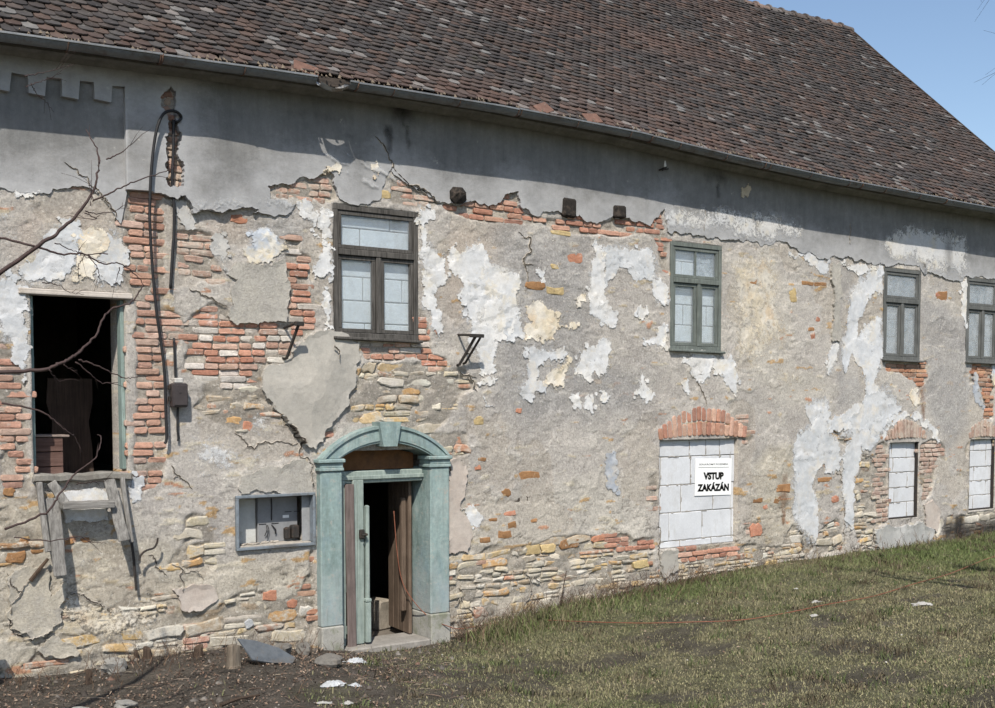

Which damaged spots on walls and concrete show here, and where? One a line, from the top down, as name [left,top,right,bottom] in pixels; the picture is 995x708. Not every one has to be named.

crack [65,162,121,227]
crack [375,136,440,202]
flaking render [0,91,342,503]
peeling [351,180,672,434]
crack [519,232,534,290]
peeling [959,278,969,329]
crack [235,405,315,489]
peeling [676,251,945,579]
flaking render [969,364,995,419]
flaking render [0,561,318,673]
flaking render [159,516,226,571]
flaking render [449,533,661,636]